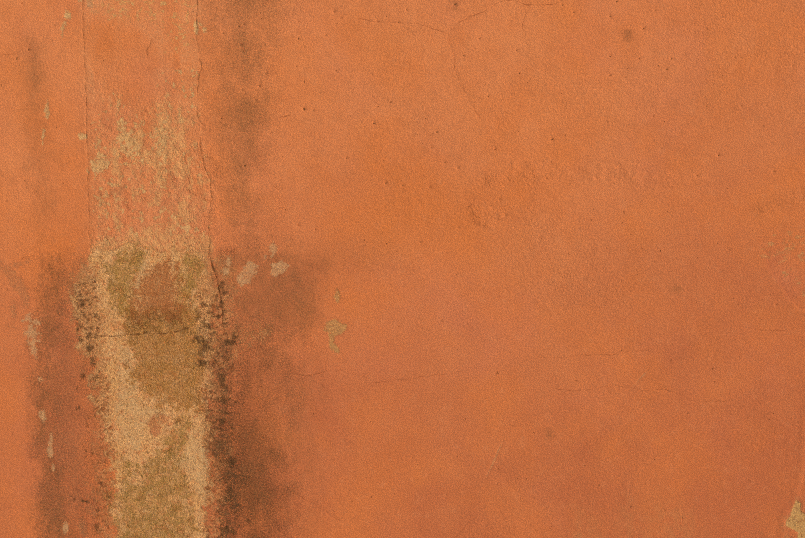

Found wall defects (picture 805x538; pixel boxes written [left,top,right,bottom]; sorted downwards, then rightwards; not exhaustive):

peeling [69,69,224,538]
damp [70,239,277,538]
peeling [223,258,258,286]
peeling [786,501,805,538]